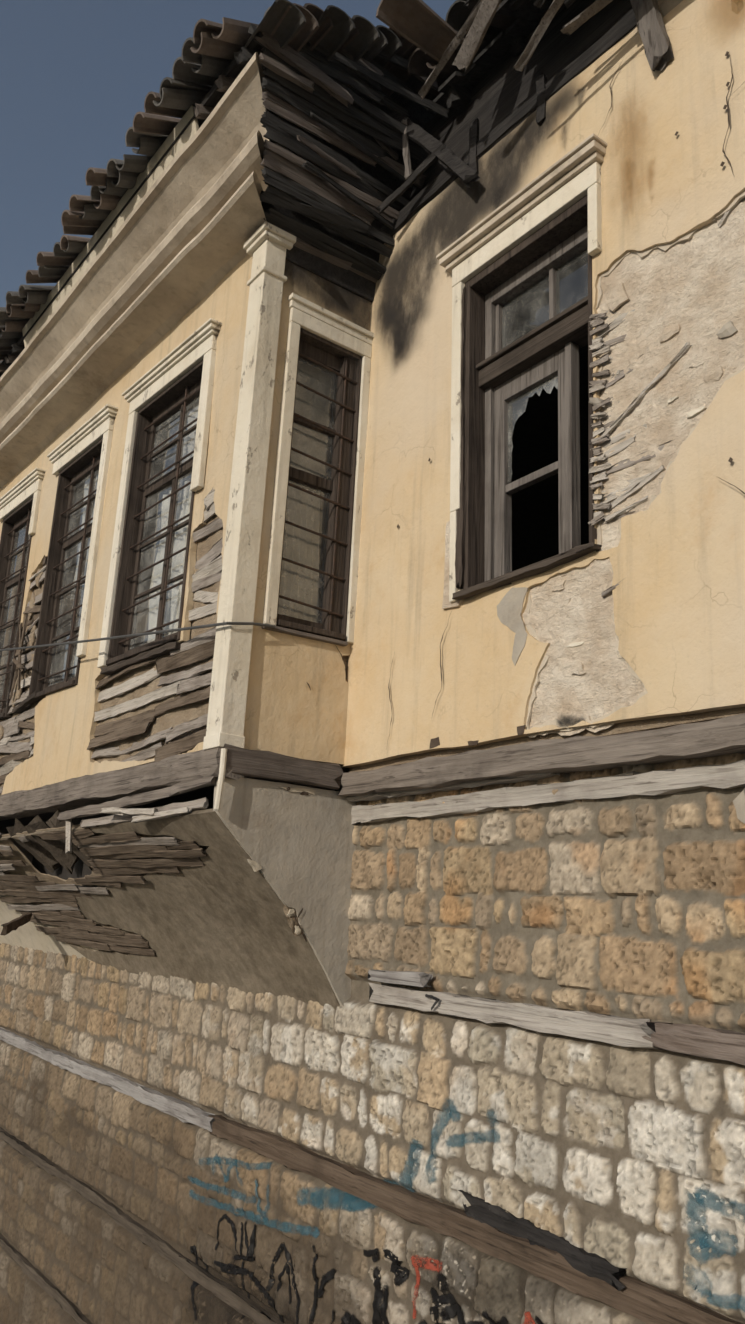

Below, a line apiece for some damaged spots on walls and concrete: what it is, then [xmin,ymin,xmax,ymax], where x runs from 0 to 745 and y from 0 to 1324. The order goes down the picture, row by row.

crack [722,53,735,177]
water stain [436,133,607,273]
spalling [517,191,745,737]